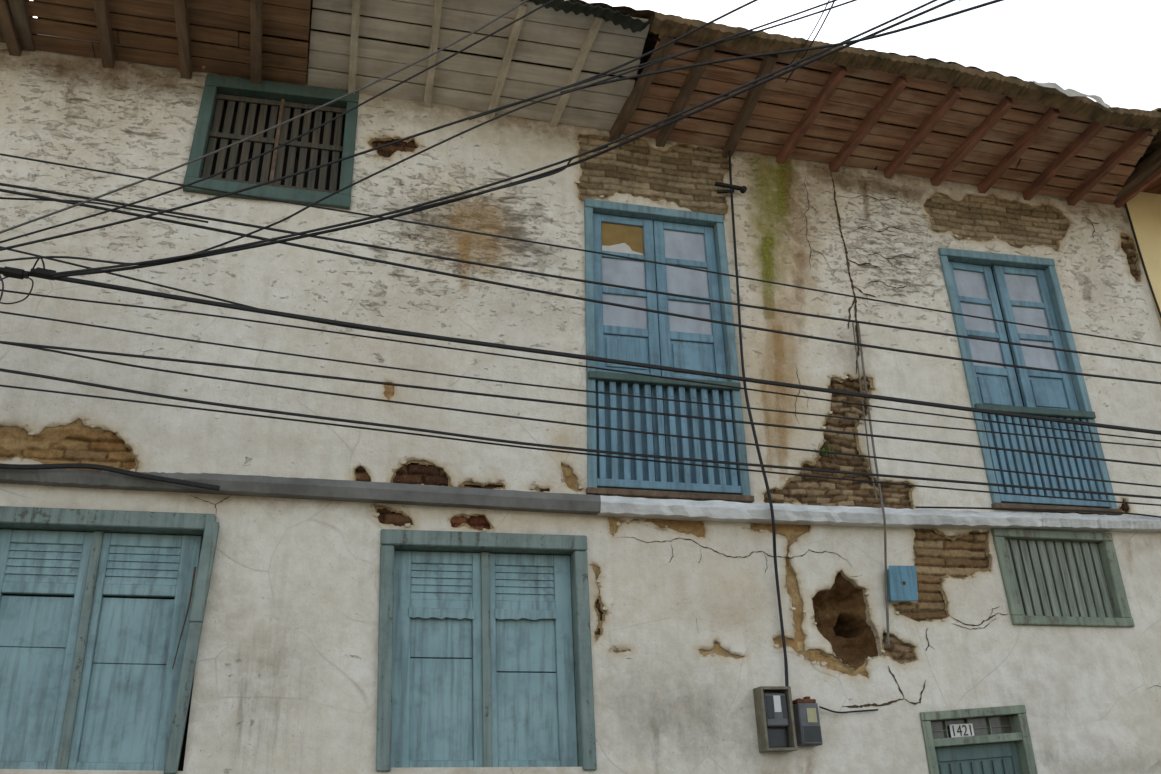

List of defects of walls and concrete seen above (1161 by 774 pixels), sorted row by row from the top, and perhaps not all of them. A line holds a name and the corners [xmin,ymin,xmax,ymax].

spalling [575,135,732,226]
spalling [924,193,1069,251]
water stain [763,238,773,317]
crack [795,171,918,374]
spalling [0,418,139,472]
spalling [390,460,505,489]
spalling [764,375,915,509]
crack [617,537,850,572]
spalling [750,523,917,678]
spalling [892,528,992,622]
crack [926,607,1007,650]
crack [842,666,926,708]